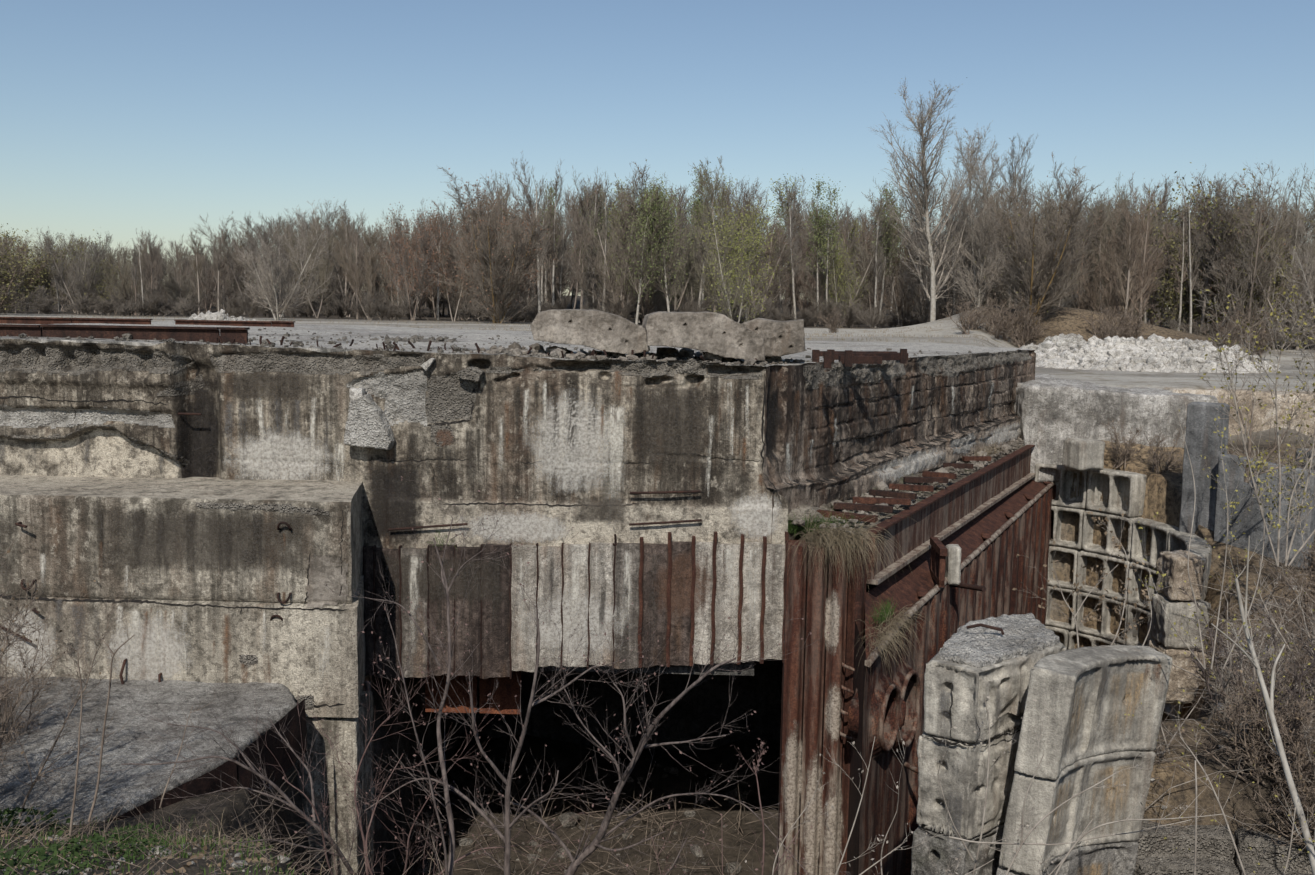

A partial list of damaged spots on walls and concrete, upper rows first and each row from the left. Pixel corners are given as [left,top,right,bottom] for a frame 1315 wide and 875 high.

crack [0,396,166,419]
spalling [0,405,202,466]
spalling [0,335,762,446]
water stain [500,383,624,521]
water stain [365,436,421,541]
water stain [96,509,315,578]
water stain [460,513,565,541]
water stain [383,557,503,628]
rust [659,555,707,612]
water stain [5,613,55,676]
water stain [110,606,186,680]
rust [106,699,307,823]